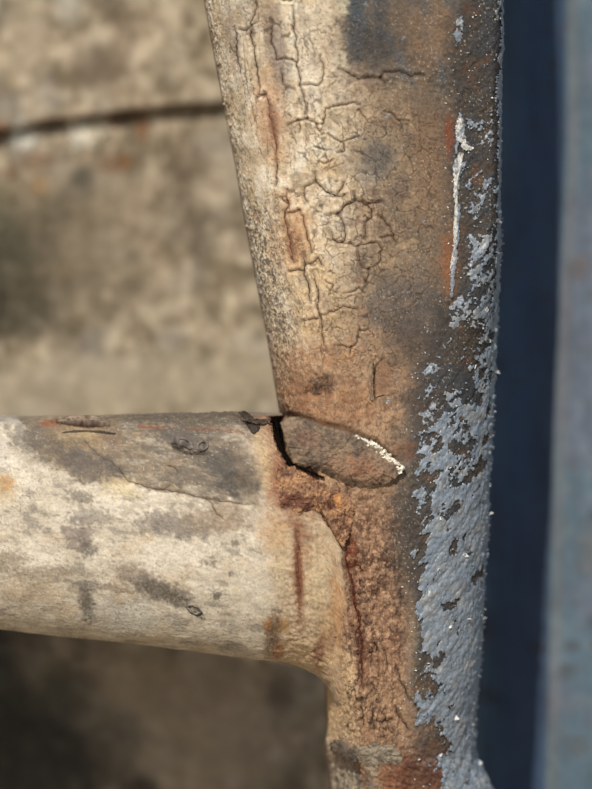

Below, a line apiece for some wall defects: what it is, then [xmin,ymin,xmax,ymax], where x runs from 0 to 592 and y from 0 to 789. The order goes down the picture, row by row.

crack [344,70,422,82]
crack [235,0,396,352]
crack [272,420,325,479]
crack [94,450,256,517]
rust [328,494,343,510]